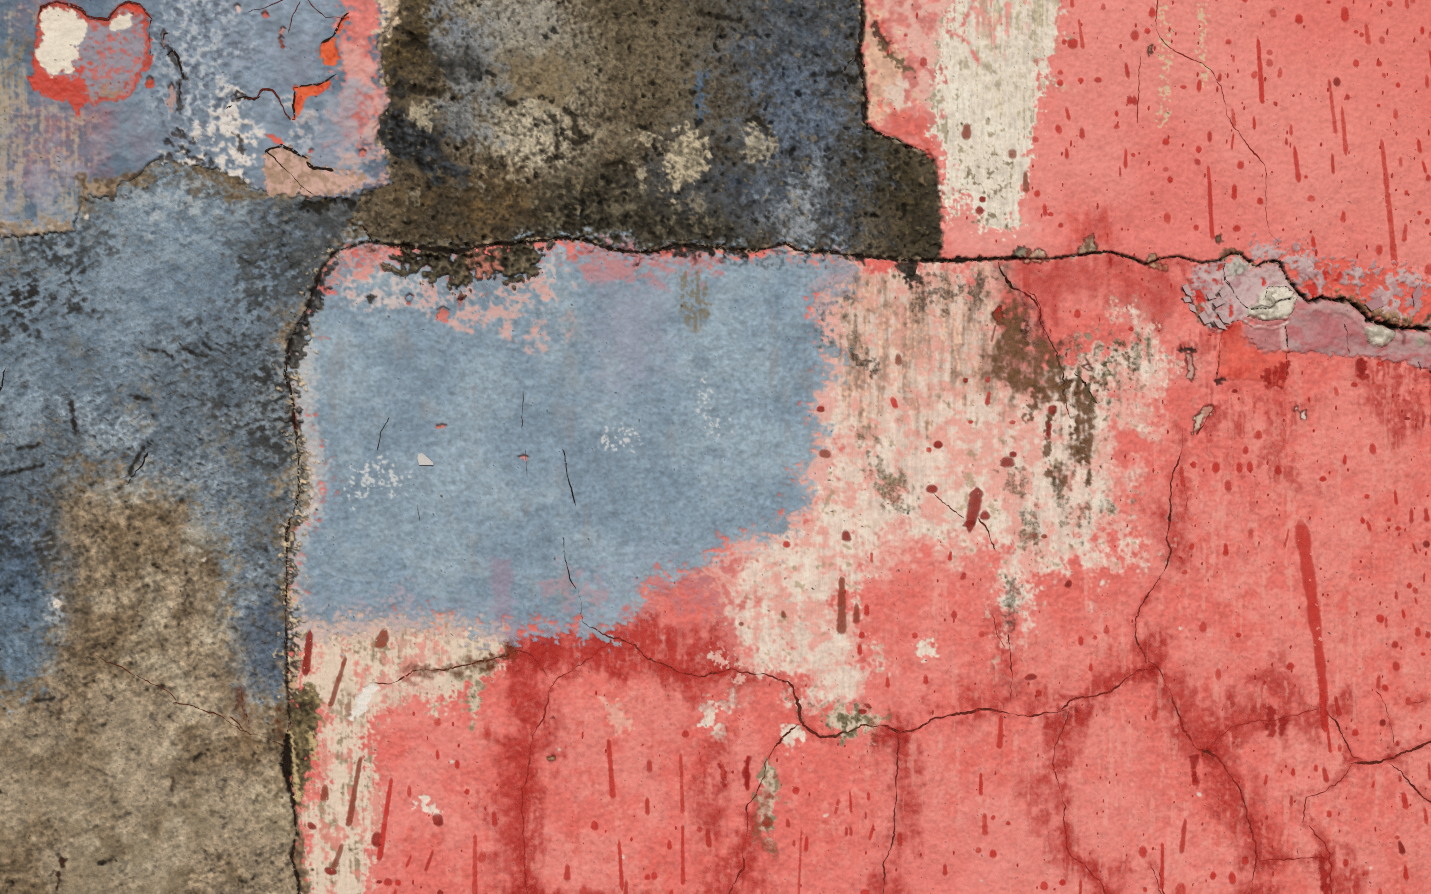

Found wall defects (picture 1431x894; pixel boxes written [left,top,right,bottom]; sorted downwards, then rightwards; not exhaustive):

peeling [28,1,178,116]
crack [1135,57,1143,123]
crack [1155,0,1278,241]
spalling [262,0,1431,858]
crack [93,225,1431,894]